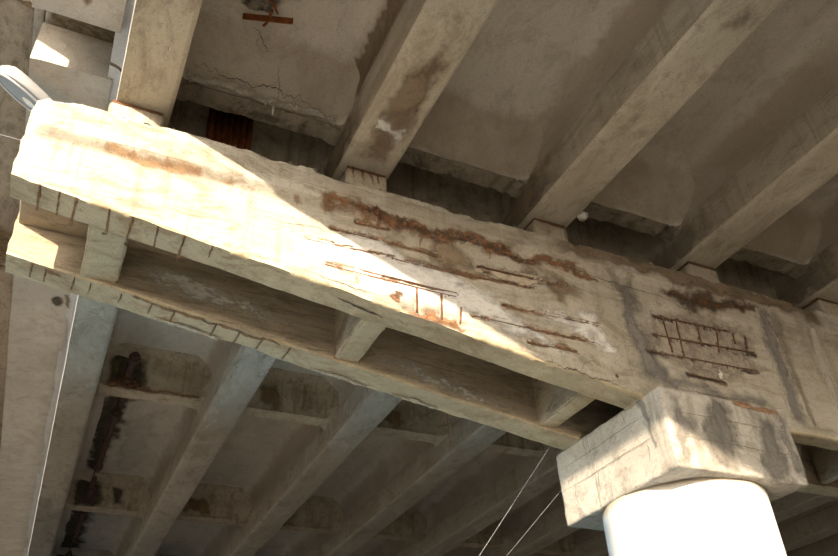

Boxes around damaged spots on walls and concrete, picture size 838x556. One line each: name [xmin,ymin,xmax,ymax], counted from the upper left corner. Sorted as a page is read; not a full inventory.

rust [205,107,254,150]
damp [369,58,444,160]
spalling [305,219,568,289]
rust [322,192,598,282]
damp [107,355,200,398]
rust [133,296,279,349]
spalling [324,261,598,354]
damp [560,240,817,421]
spalling [646,315,759,385]
damp [87,396,132,470]
damp [674,398,739,471]
damp [759,416,803,481]